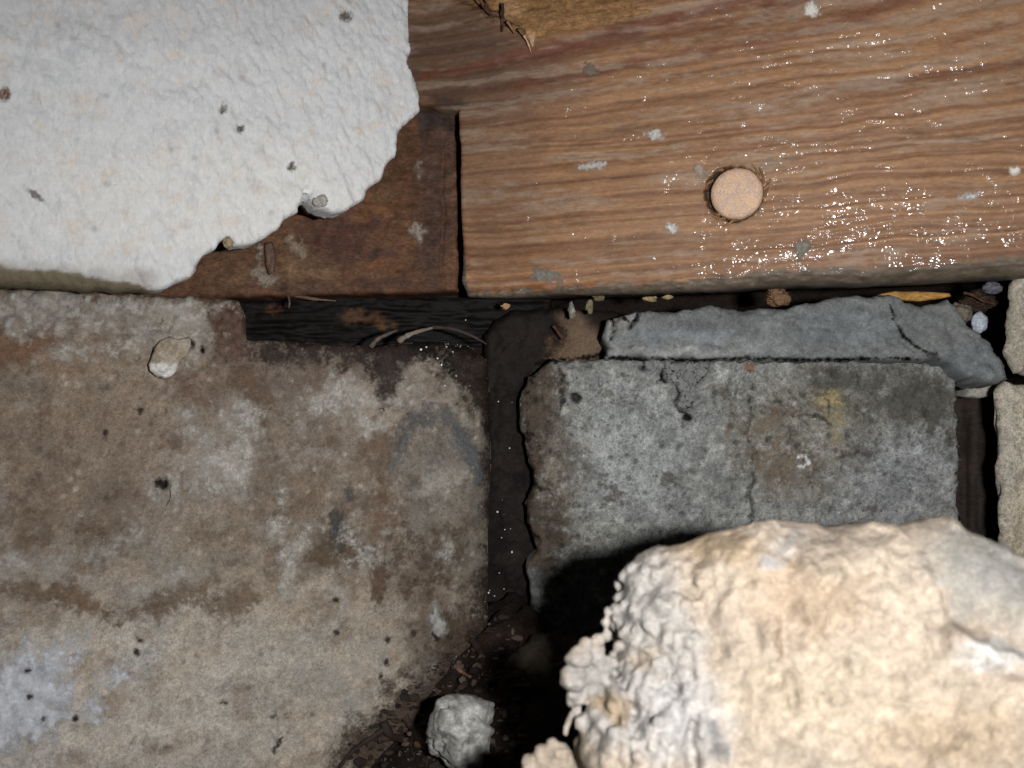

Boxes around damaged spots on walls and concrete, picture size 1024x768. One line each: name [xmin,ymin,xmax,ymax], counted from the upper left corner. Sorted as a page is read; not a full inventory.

damp [145,400,266,504]
crack [525,307,938,553]
damp [0,547,259,627]
damp [260,308,567,768]
damp [0,627,132,753]